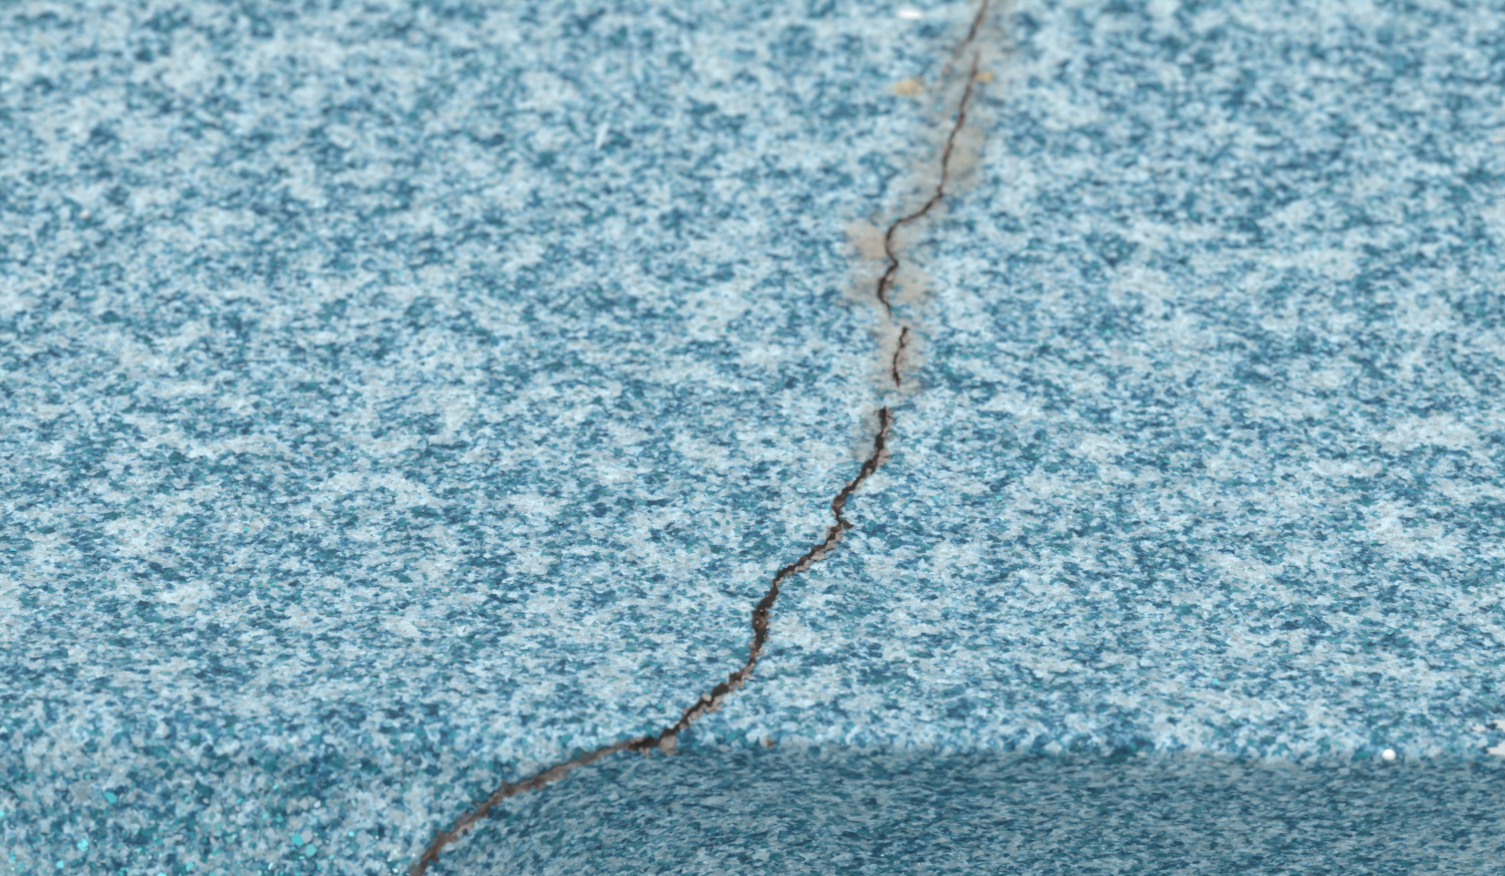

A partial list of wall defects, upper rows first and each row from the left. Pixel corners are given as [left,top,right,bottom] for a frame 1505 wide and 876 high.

crack [410,0,988,876]